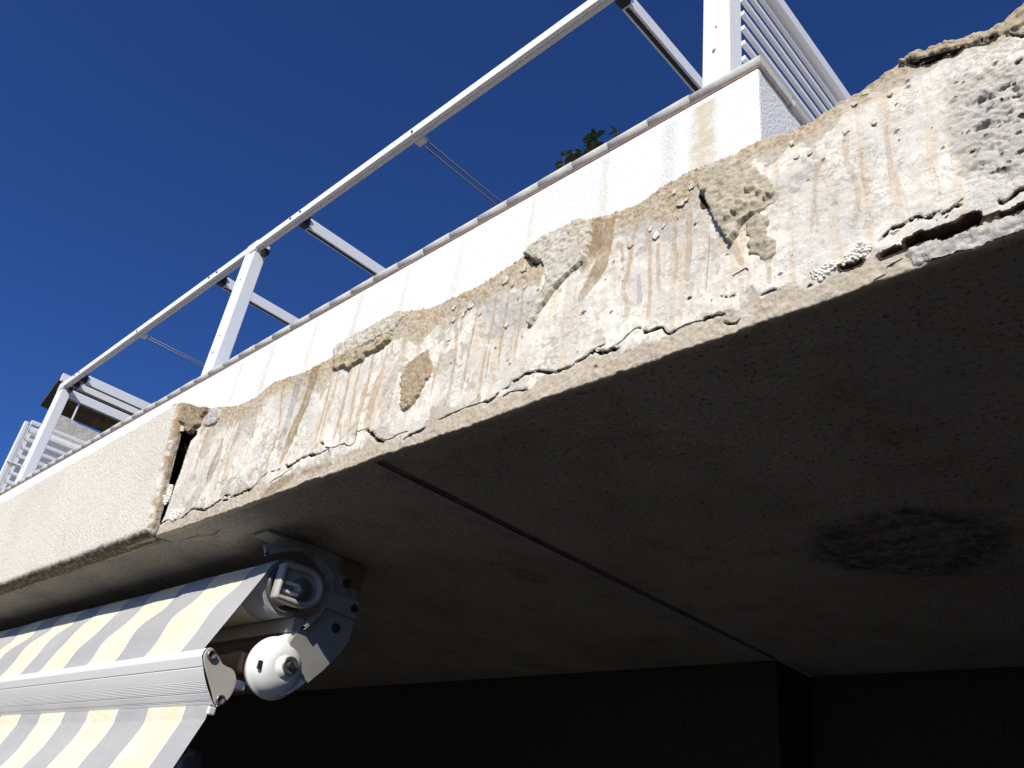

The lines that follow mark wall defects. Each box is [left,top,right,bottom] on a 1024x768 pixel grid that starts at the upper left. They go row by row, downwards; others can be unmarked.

hole [960,56,1024,175]
spalling [172,404,229,434]
corrosion [318,343,393,439]
spalling [396,349,433,411]
corrosion [431,298,477,388]
crack [159,232,749,541]
corrosion [479,282,524,381]
corrosion [582,216,660,302]
crack [761,288,777,297]
crack [873,198,964,283]
spalling [984,201,1024,222]
crack [996,186,1024,206]